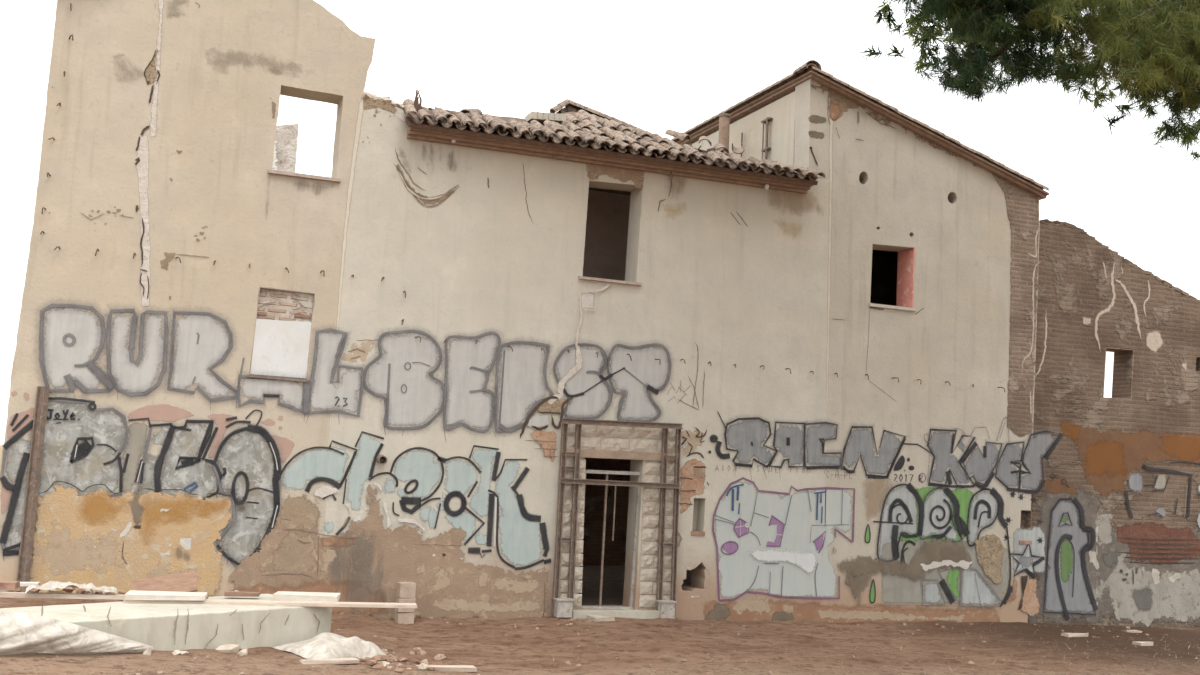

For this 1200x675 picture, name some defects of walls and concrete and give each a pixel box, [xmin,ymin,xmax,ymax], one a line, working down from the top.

crack [135,0,164,307]
crack [548,284,611,404]
crack [1083,262,1187,371]
flaking render [520,396,573,462]
flaking render [679,428,709,513]
flaking render [29,481,550,619]